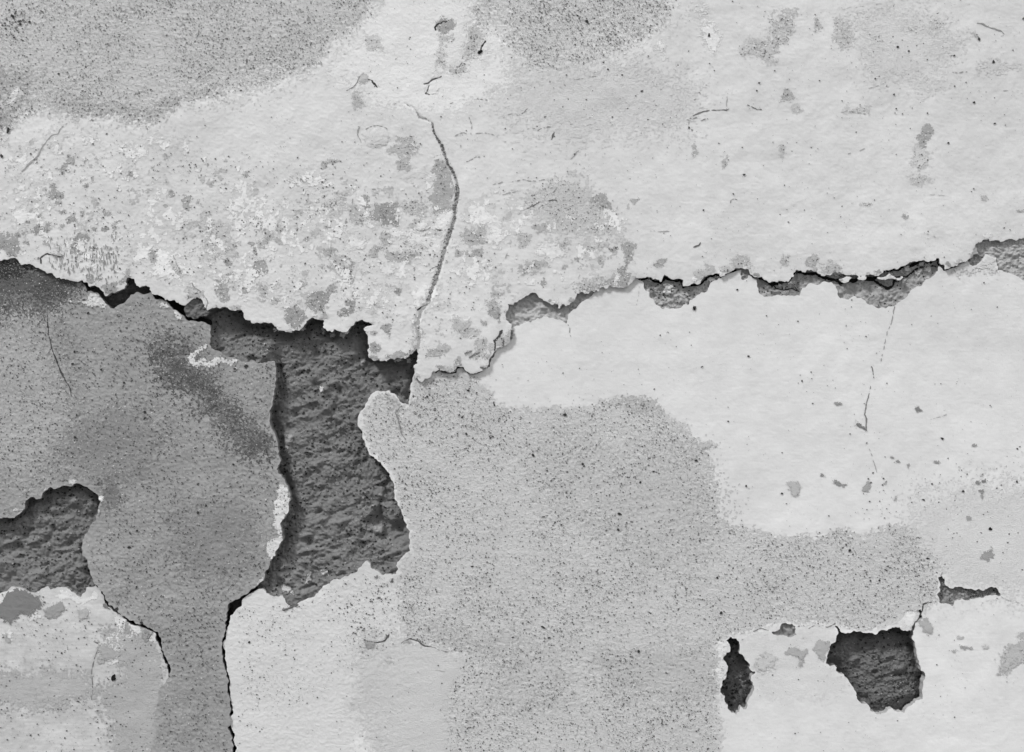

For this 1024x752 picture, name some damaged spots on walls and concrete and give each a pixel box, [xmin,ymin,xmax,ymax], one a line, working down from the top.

crack [403,41,555,375]
crack [112,606,171,672]
crack [223,608,237,752]